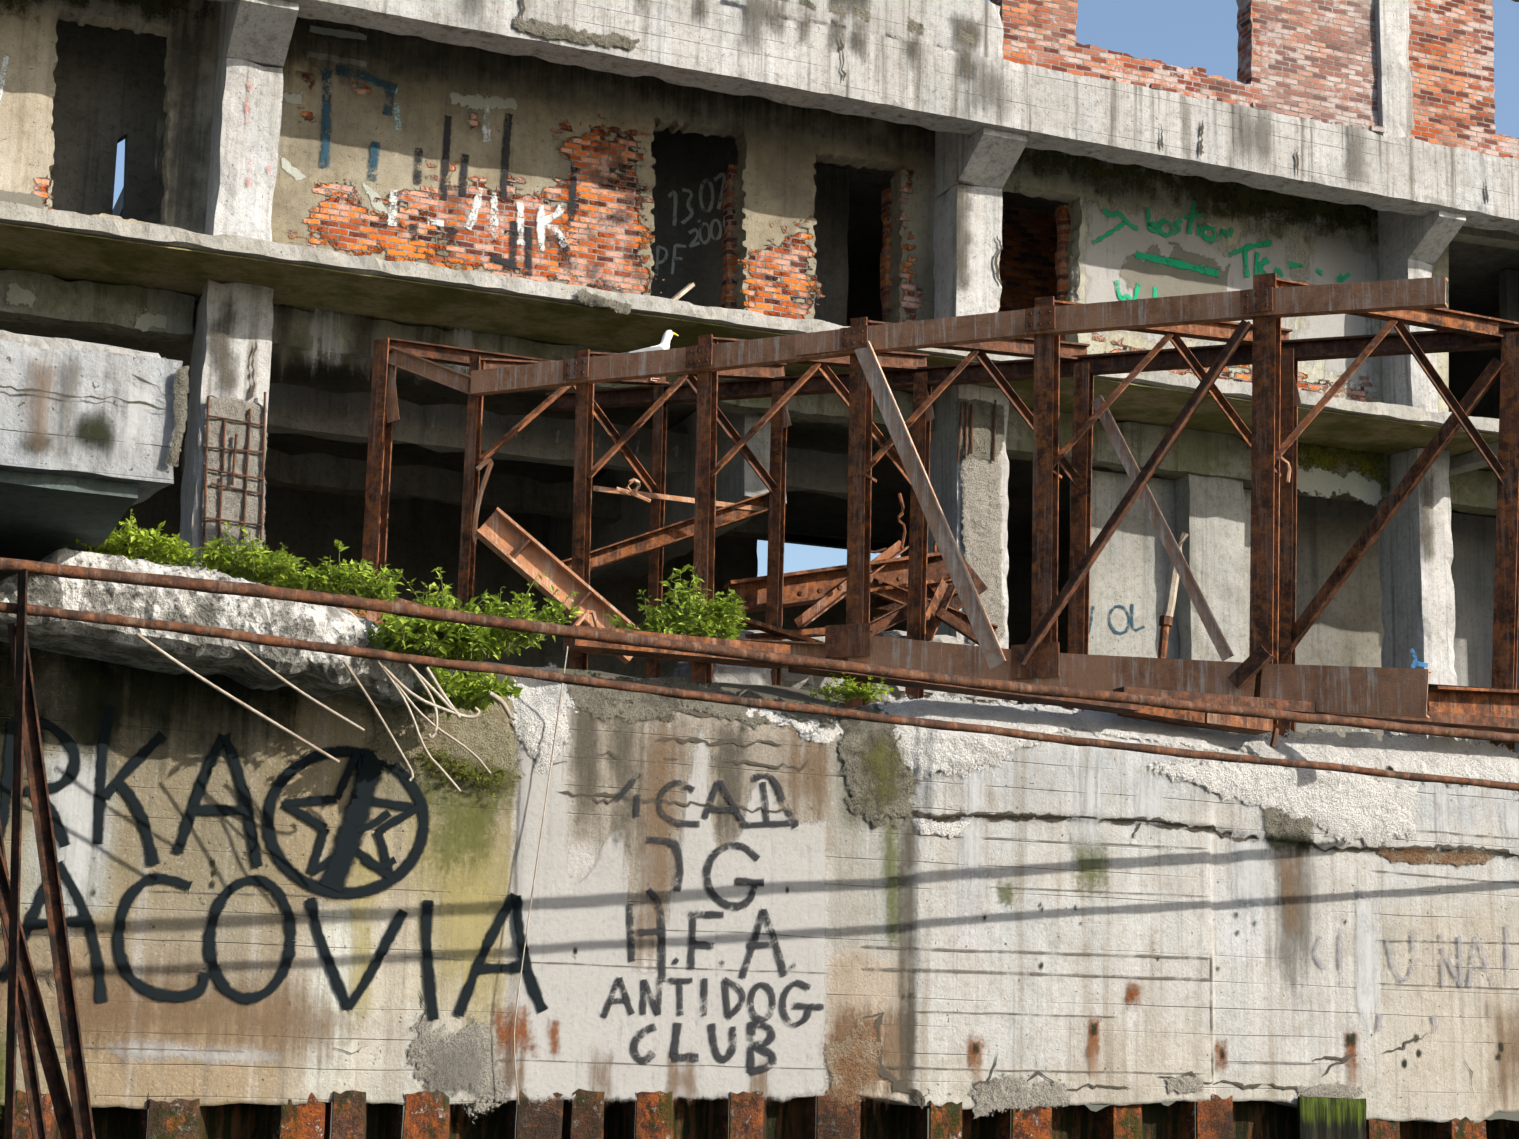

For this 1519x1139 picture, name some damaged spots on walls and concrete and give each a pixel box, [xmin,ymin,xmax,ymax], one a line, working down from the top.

peeling [280,113,665,314]
peeling [738,215,825,319]
leakage [36,357,81,448]
leakage [117,381,152,448]
spalling [238,644,1519,866]
crack [883,810,1260,843]
crack [1311,842,1519,869]
leakage [832,823,916,1084]
leakage [77,977,334,1063]
spalling [405,1012,513,1124]
rust [493,1009,559,1089]
spalling [968,1073,1074,1119]